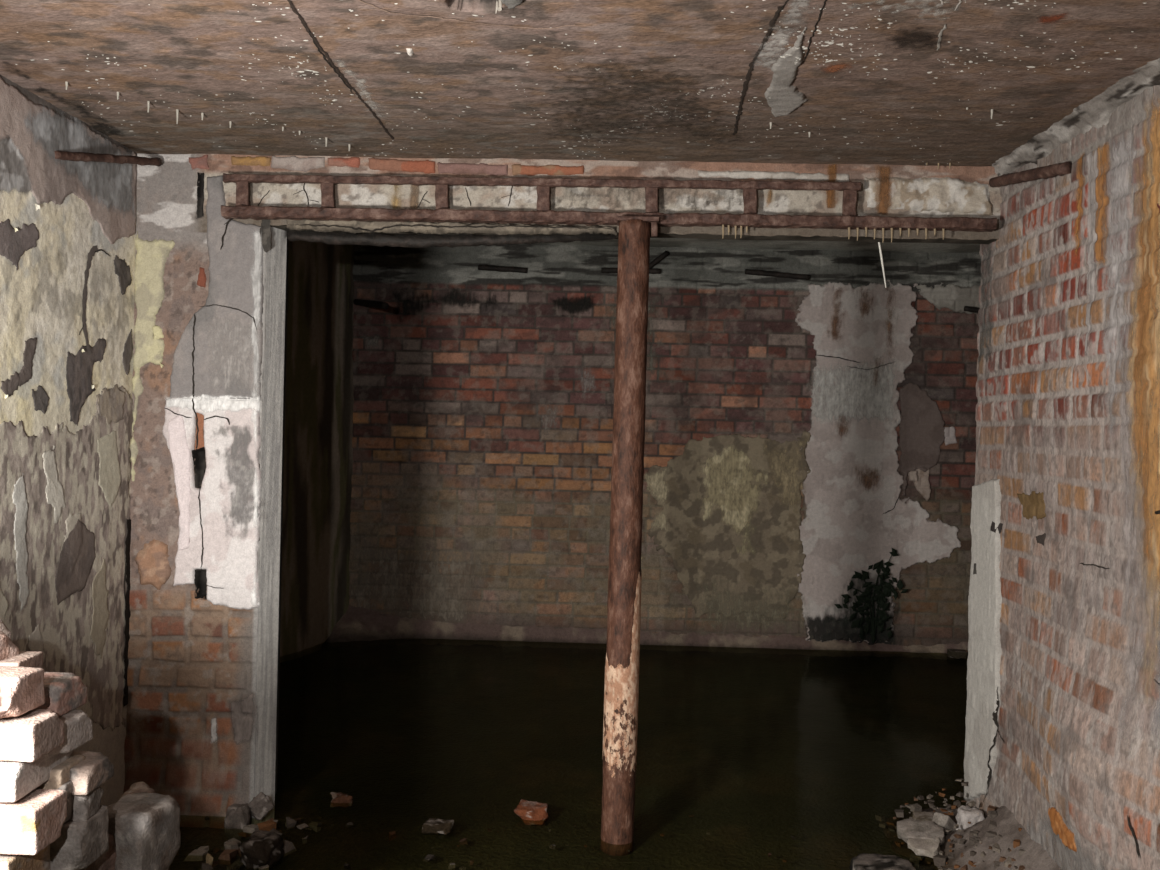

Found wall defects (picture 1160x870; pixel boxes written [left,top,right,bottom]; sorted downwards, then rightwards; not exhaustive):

crack [287,0,394,139]
spalling [496,0,523,13]
crack [732,0,827,135]
corrosion [392,185,419,209]
corrosion [827,164,836,208]
corrosion [878,167,892,214]
peeling [0,76,192,731]
crack [165,304,257,600]
flaking render [908,469,931,501]
corrosion [1127,108,1160,579]